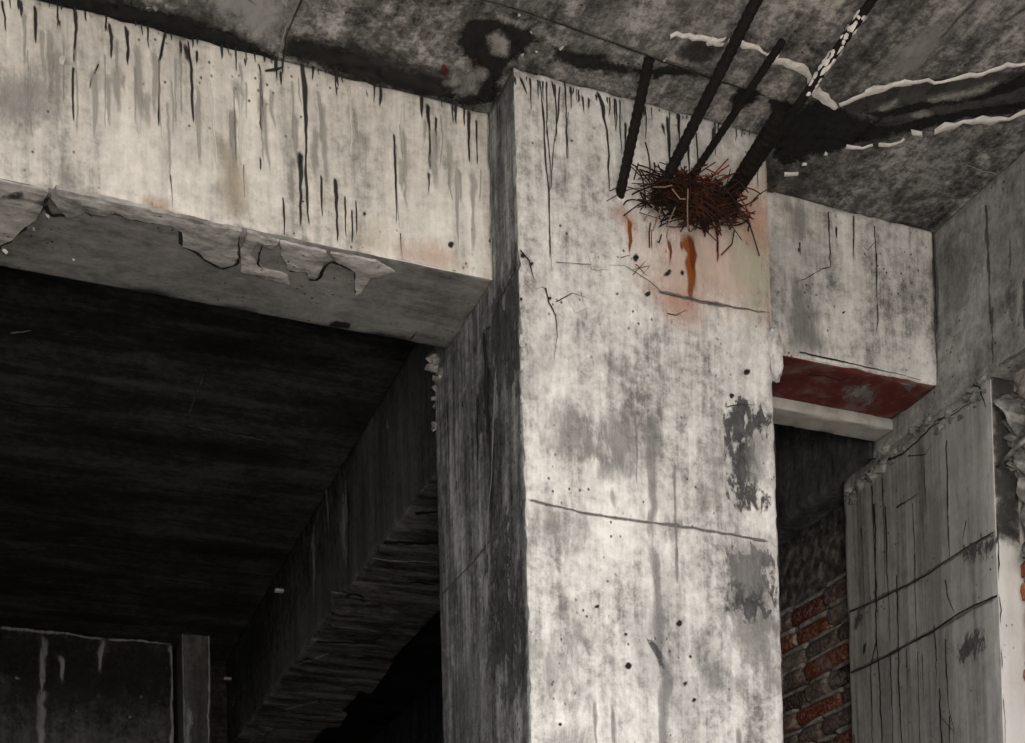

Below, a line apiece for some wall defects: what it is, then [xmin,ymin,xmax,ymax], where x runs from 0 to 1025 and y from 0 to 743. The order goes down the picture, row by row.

damp [1,0,627,248]
spalling [616,56,667,199]
spalling [651,0,786,206]
spalling [725,0,878,201]
flaking render [0,179,395,296]
rust [668,194,761,304]
damp [723,396,772,513]
damp [723,542,777,659]
crack [854,440,967,743]